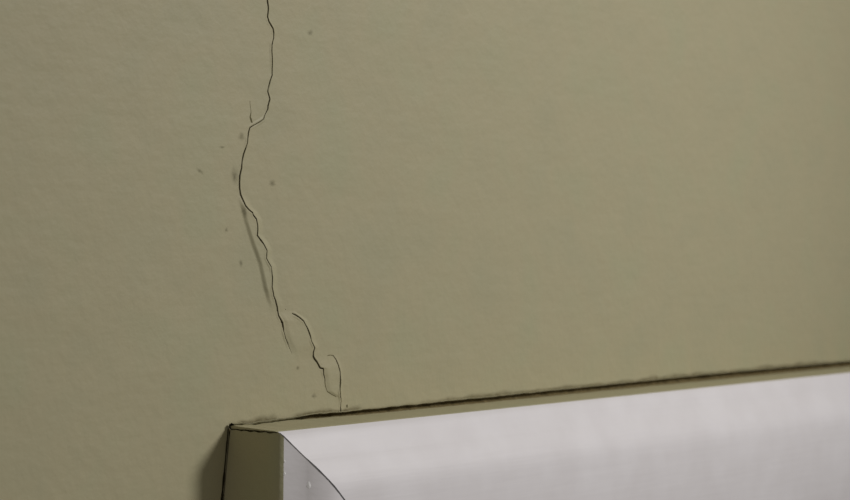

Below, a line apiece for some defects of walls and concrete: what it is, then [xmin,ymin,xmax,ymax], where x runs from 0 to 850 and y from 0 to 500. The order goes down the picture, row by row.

crack [221,0,850,500]